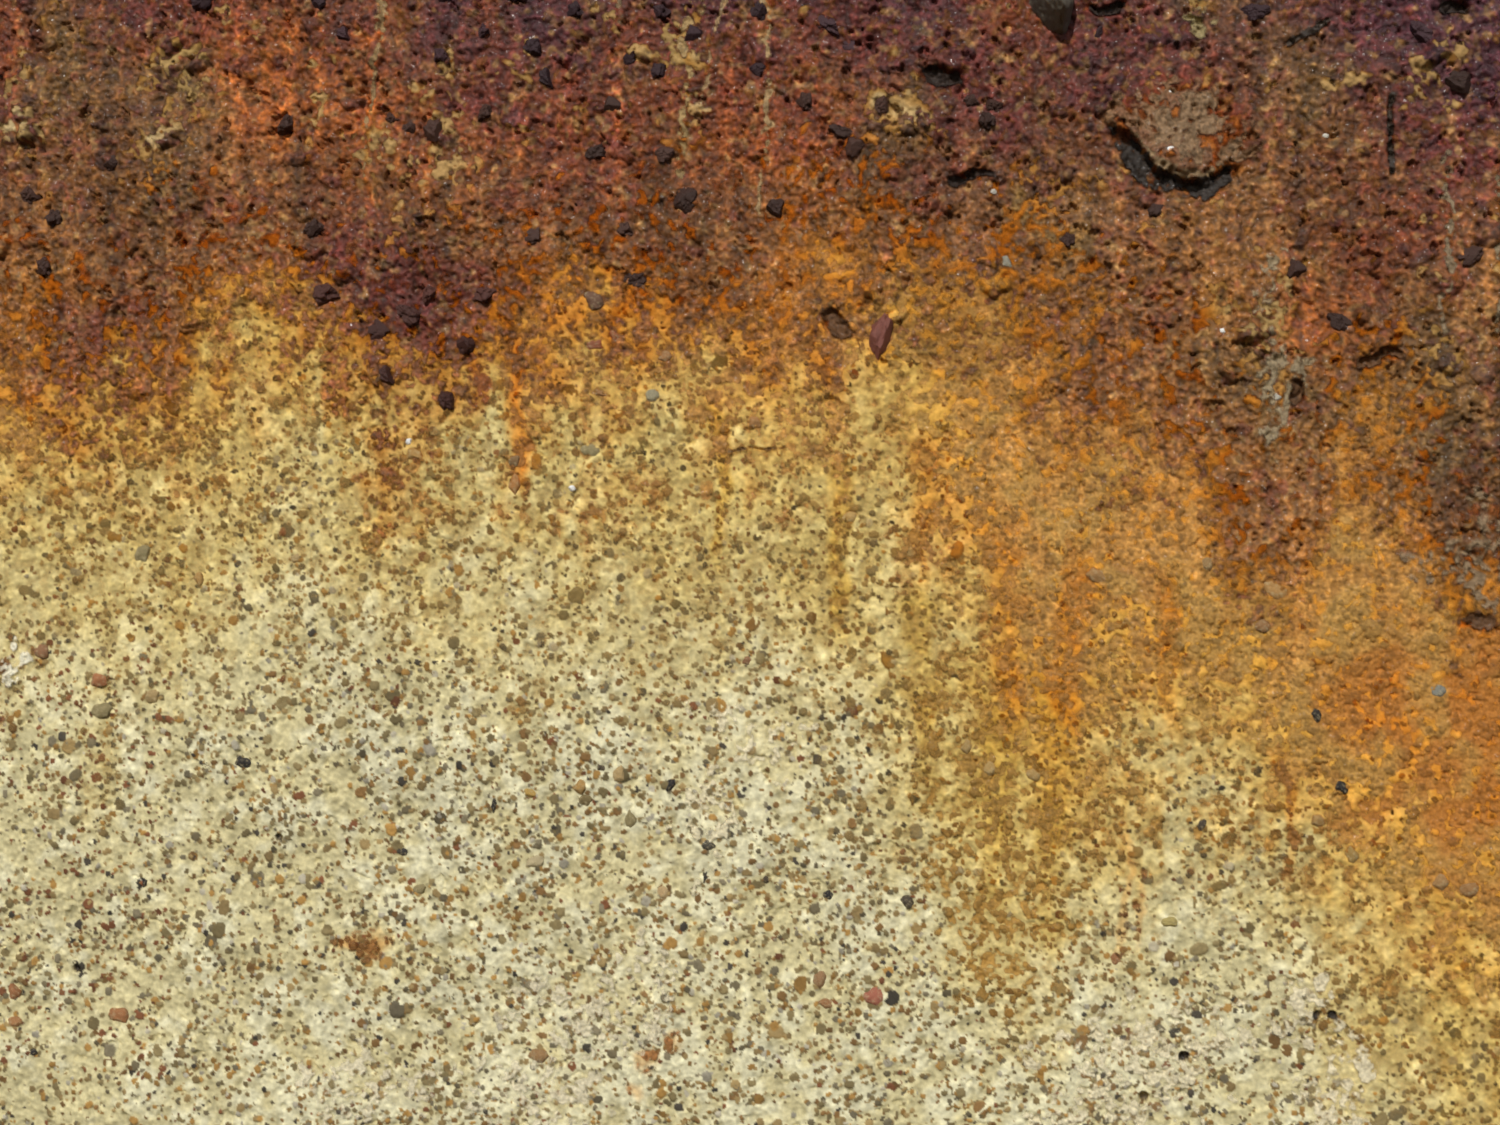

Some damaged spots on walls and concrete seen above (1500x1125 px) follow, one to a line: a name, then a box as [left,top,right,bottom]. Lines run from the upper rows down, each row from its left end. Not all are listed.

corrosion [368,408,405,451]
corrosion [395,395,429,420]
corrosion [589,421,613,456]
corrosion [95,481,157,523]
corrosion [352,426,454,553]
corrosion [492,481,531,523]
corrosion [579,451,667,544]
corrosion [895,499,965,584]
corrosion [1025,750,1164,855]
corrosion [1249,819,1302,851]
corrosion [1120,869,1152,935]
corrosion [1322,856,1365,915]